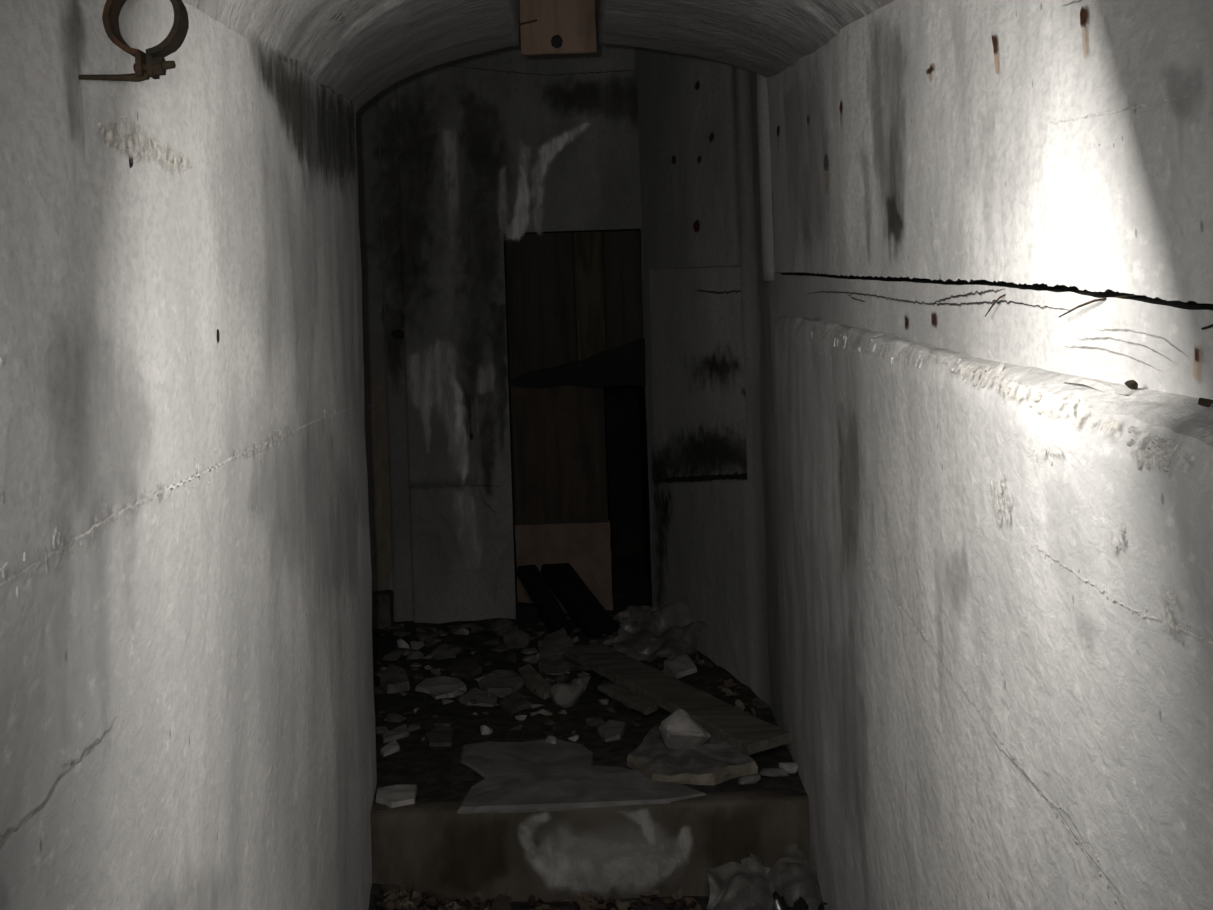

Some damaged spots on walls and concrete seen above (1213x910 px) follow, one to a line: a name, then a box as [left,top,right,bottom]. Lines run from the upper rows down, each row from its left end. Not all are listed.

leakage [261,54,356,185]
leakage [500,84,638,239]
leakage [887,199,902,239]
crack [777,272,1213,311]
crack [1065,329,1188,371]
leakage [389,341,494,566]
crack [0,716,118,850]